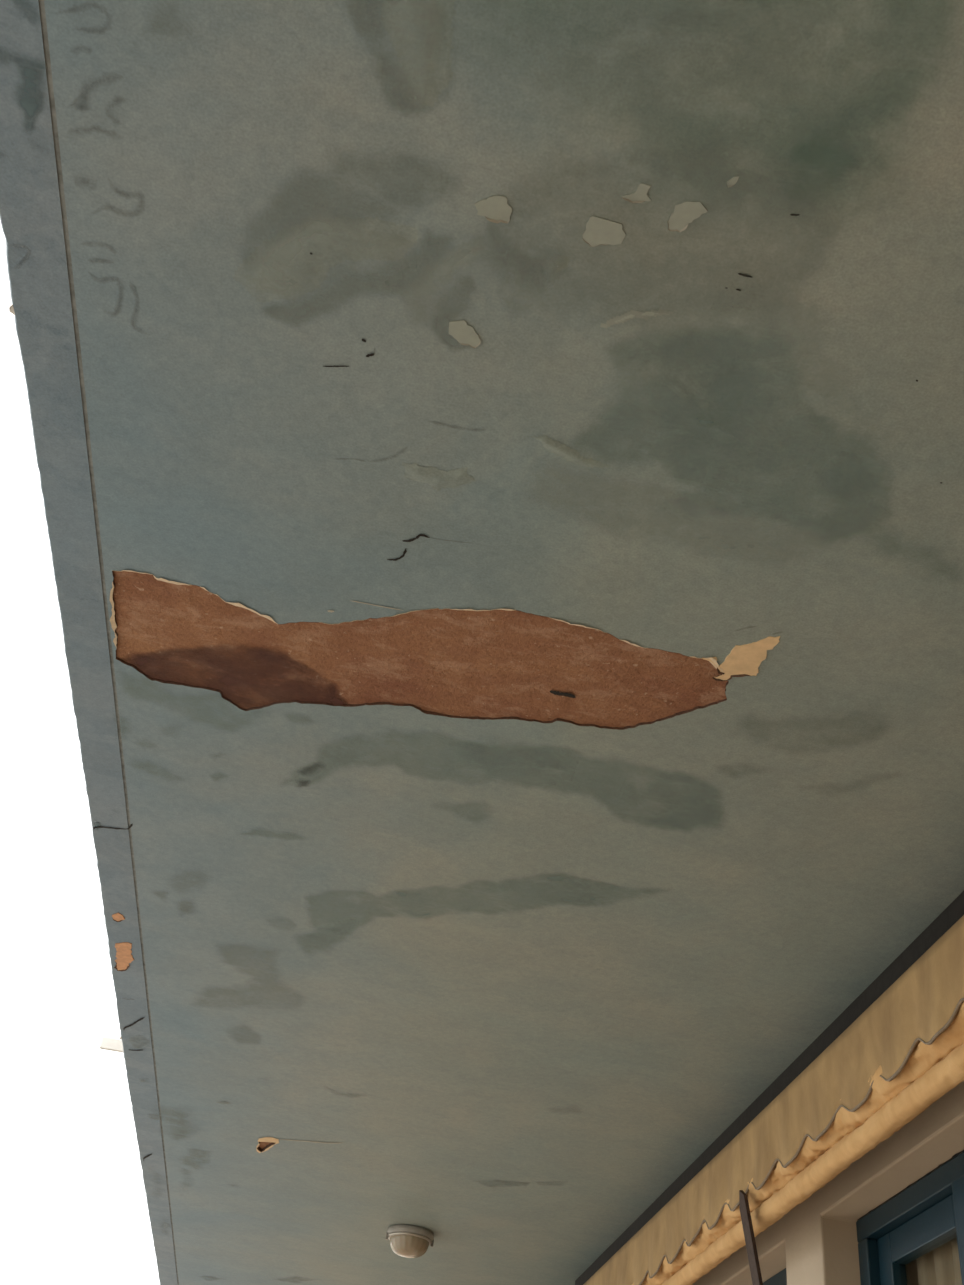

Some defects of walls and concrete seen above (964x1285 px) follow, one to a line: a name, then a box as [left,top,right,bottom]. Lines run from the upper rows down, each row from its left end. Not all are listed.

damp [19,64,43,129]
peeling [475,195,512,224]
peeling [583,216,626,247]
peeling [667,201,708,232]
peeling [449,320,480,348]
spalling [110,570,780,730]
peeling [114,942,134,971]
spalling [256,1137,279,1153]